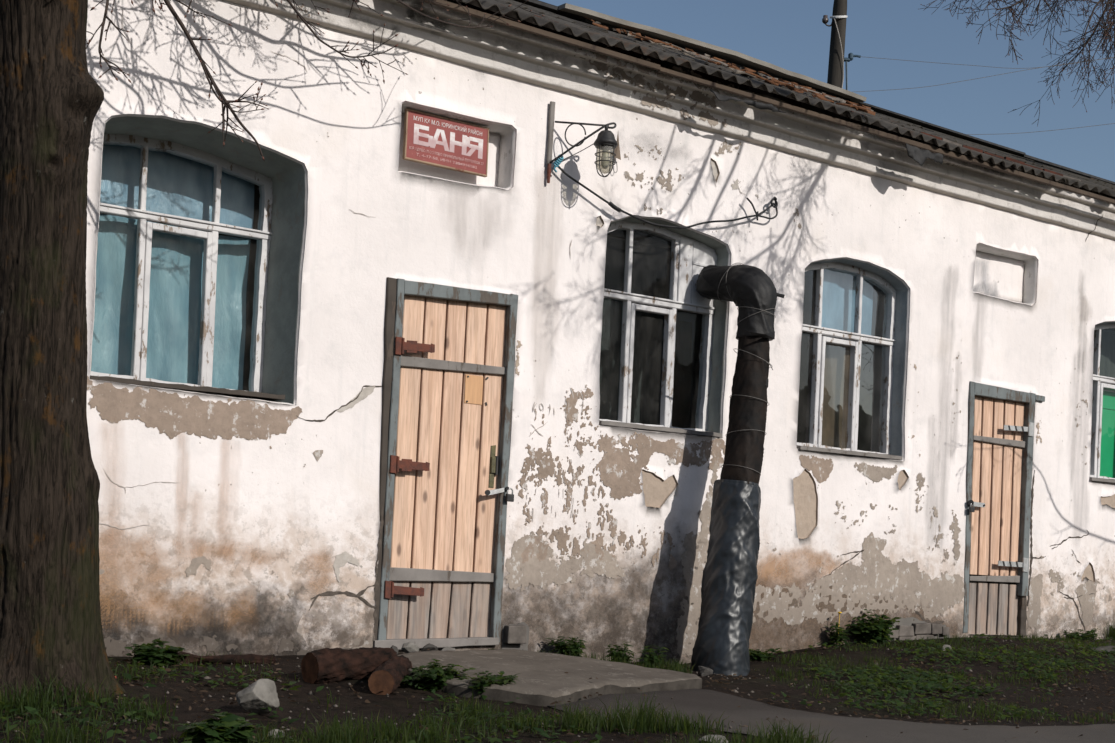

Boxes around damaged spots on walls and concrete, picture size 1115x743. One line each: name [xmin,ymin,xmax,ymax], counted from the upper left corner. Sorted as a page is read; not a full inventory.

peeling [574,45,743,179]
peeling [624,144,684,214]
flaking render [87,376,302,449]
crack [297,385,382,422]
crack [309,506,384,644]
flaking render [502,385,725,659]
flaking render [752,455,965,641]
crack [1027,472,1089,605]
flaking render [1026,556,1112,630]
crack [1059,591,1093,632]
spalling [1101,494,1115,508]